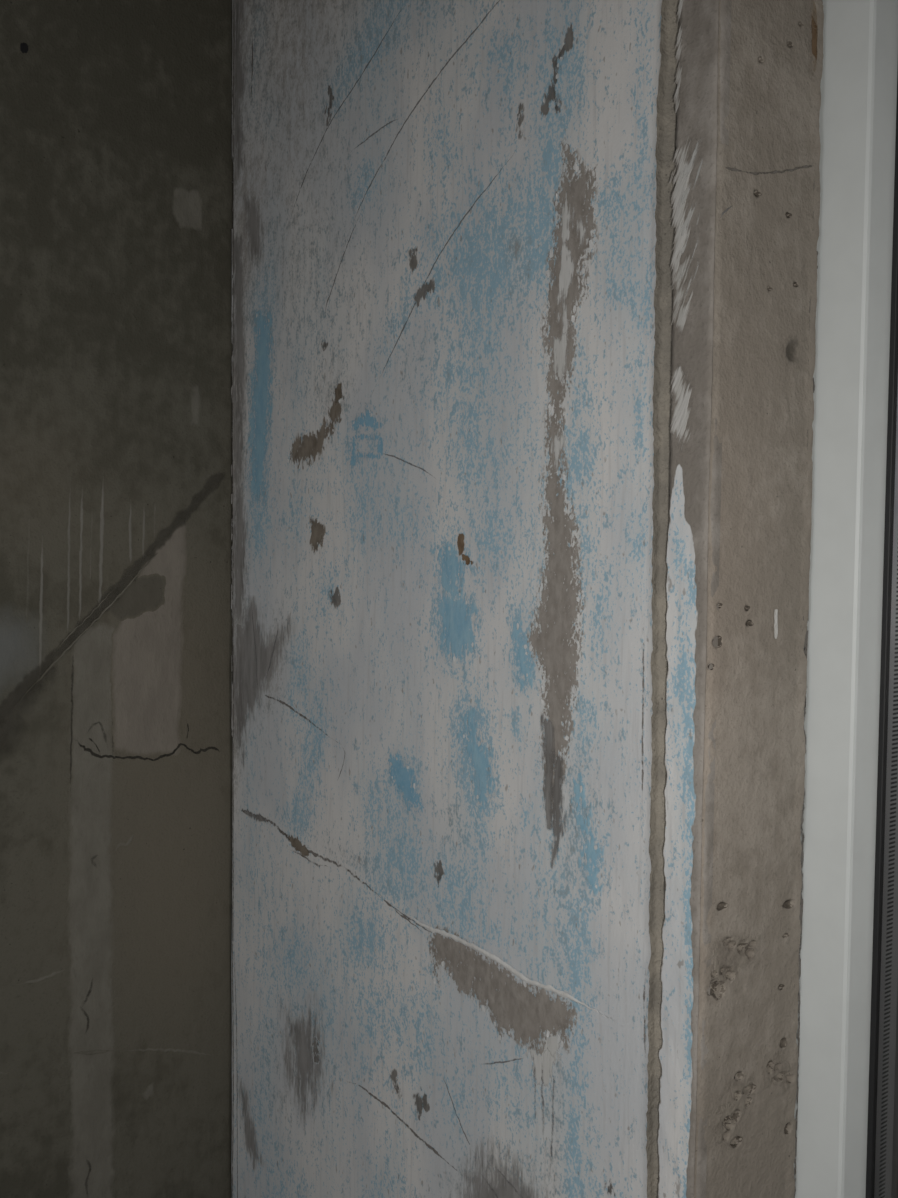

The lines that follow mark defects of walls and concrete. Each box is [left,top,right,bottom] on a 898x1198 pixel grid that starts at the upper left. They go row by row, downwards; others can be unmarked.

spalling [513,21,576,142]
flaking render [506,135,607,898]
crack [79,605,419,1198]
flaking render [426,923,578,1129]